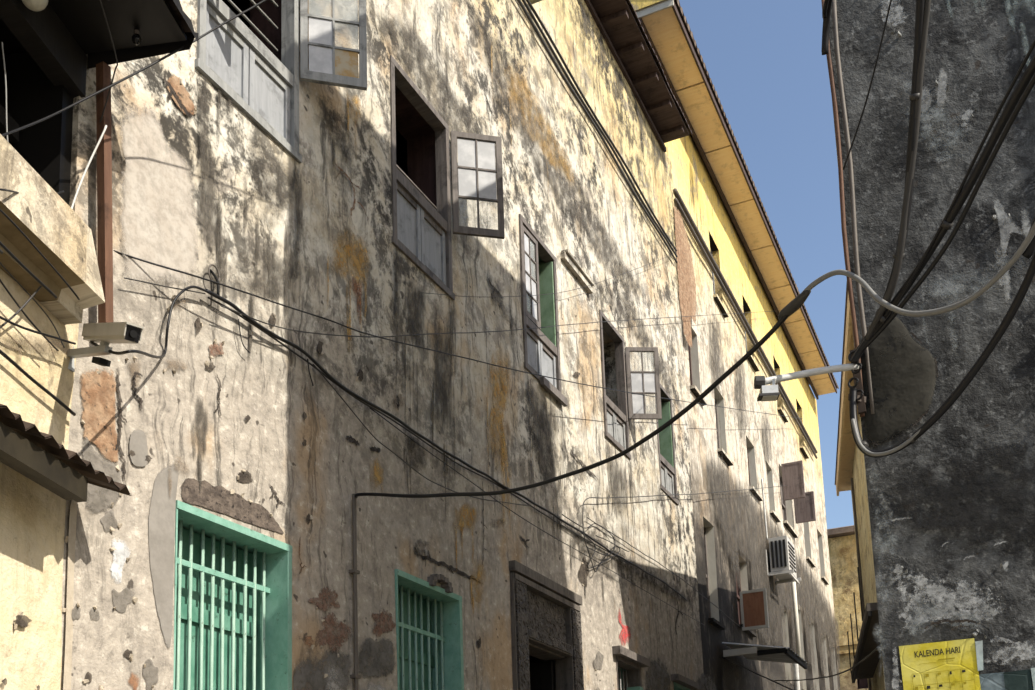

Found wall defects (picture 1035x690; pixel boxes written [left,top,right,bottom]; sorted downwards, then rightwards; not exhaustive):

spalling [167,75,197,115]
damp [380,18,480,134]
damp [471,3,675,397]
flaking render [674,206,696,346]
flaking render [62,368,152,690]
spalling [181,469,284,534]
damp [527,380,690,606]
flaking render [124,649,158,690]
flaking render [305,587,352,690]
flaking render [372,609,396,637]